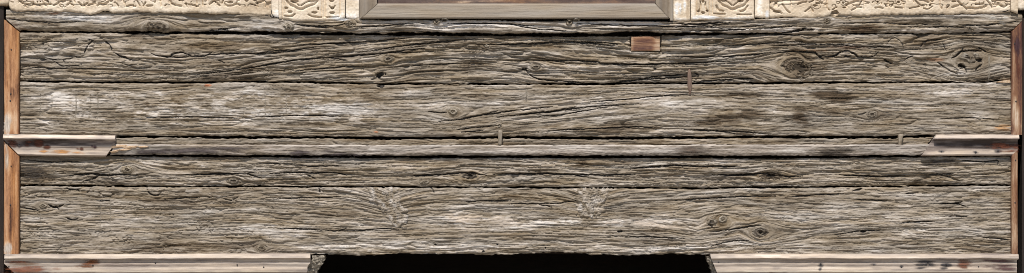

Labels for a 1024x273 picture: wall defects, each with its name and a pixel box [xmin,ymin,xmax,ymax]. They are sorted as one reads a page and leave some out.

crack [12,9,1017,133]